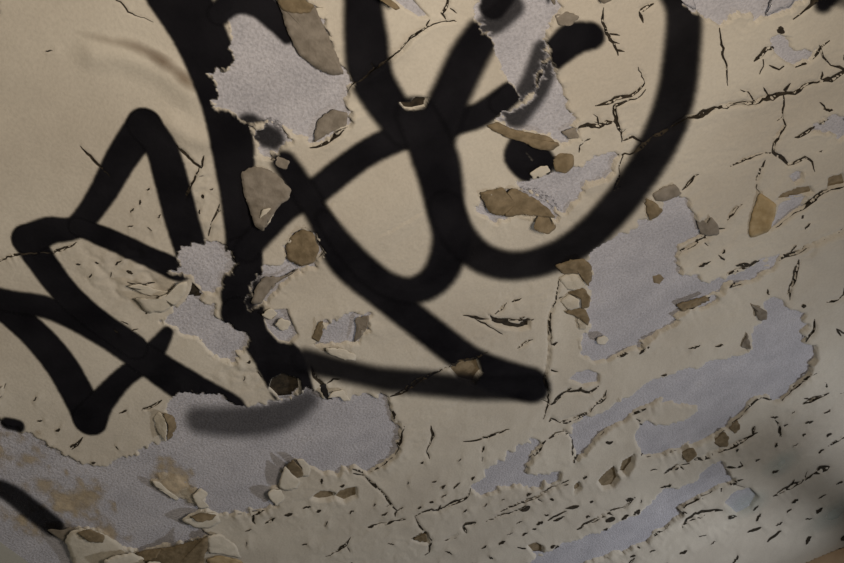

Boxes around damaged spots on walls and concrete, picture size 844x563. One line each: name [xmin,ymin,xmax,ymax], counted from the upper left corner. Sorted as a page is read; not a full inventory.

crack [601,8,625,56]
crack [639,3,654,23]
crack [793,0,818,20]
peeling [208,0,353,231]
peeling [473,0,618,234]
crack [578,28,844,191]
peeling [126,240,249,362]
peeling [245,229,323,342]
peeling [556,184,780,361]
crack [729,229,842,297]
crack [777,186,844,227]
peeling [0,384,400,563]